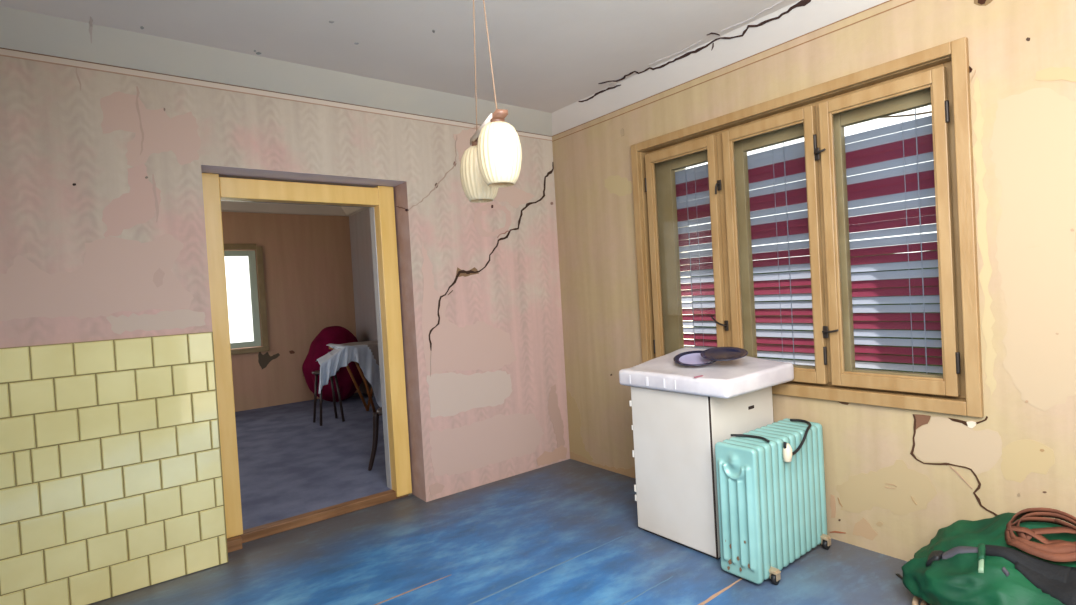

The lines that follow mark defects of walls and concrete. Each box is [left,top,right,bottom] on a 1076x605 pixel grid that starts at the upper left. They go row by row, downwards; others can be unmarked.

crack [578,0,811,102]
crack [396,136,457,210]
crack [429,162,554,376]
crack [910,414,997,516]